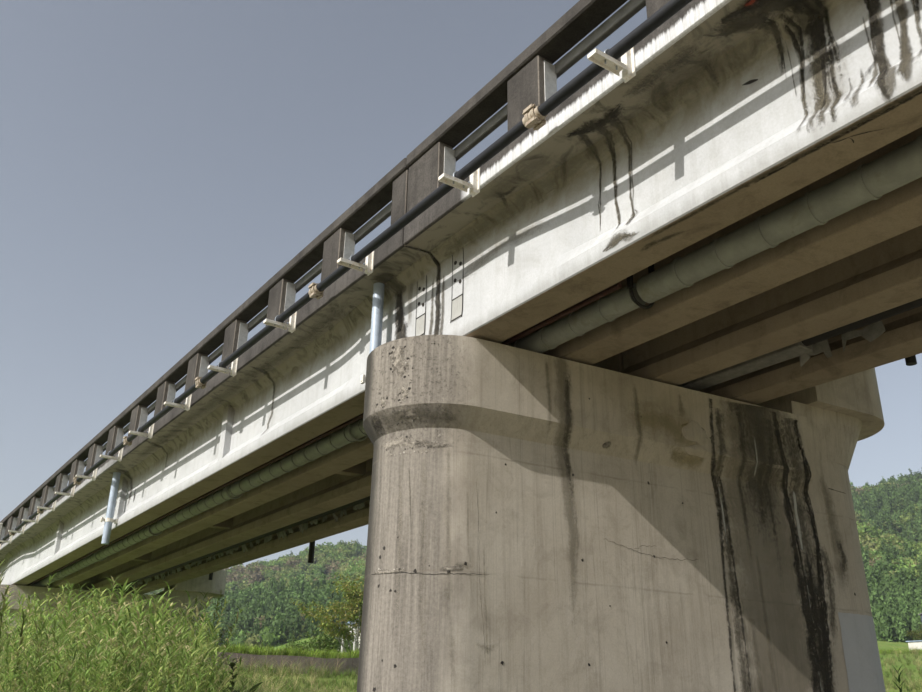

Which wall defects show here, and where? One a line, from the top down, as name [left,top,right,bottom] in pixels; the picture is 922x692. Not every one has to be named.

leakage [567,104,637,251]
leakage [646,0,922,249]
crack [372,565,489,647]
leakage [709,399,751,692]
leakage [736,404,835,692]